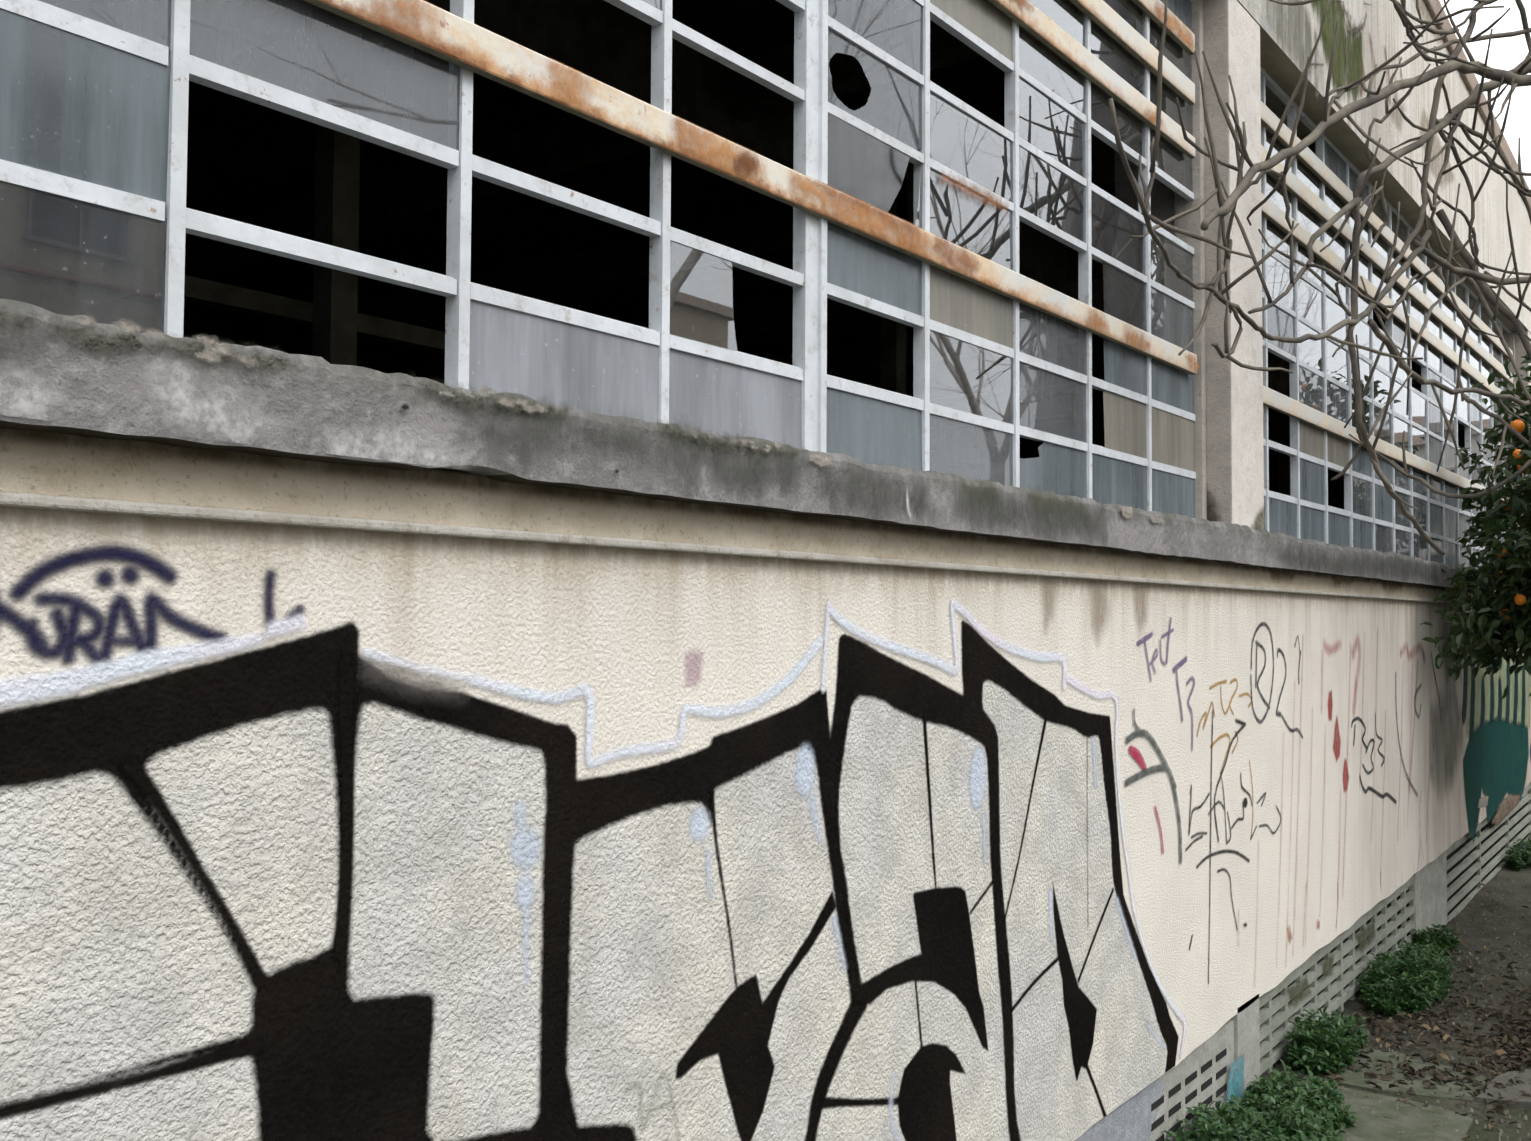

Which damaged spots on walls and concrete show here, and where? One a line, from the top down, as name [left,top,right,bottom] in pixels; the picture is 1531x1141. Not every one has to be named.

corrosion [1155,7,1193,47]
water stain [1268,0,1318,90]
corrosion [553,62,583,102]
corrosion [676,117,761,179]
corrosion [942,175,1002,206]
corrosion [792,175,978,272]